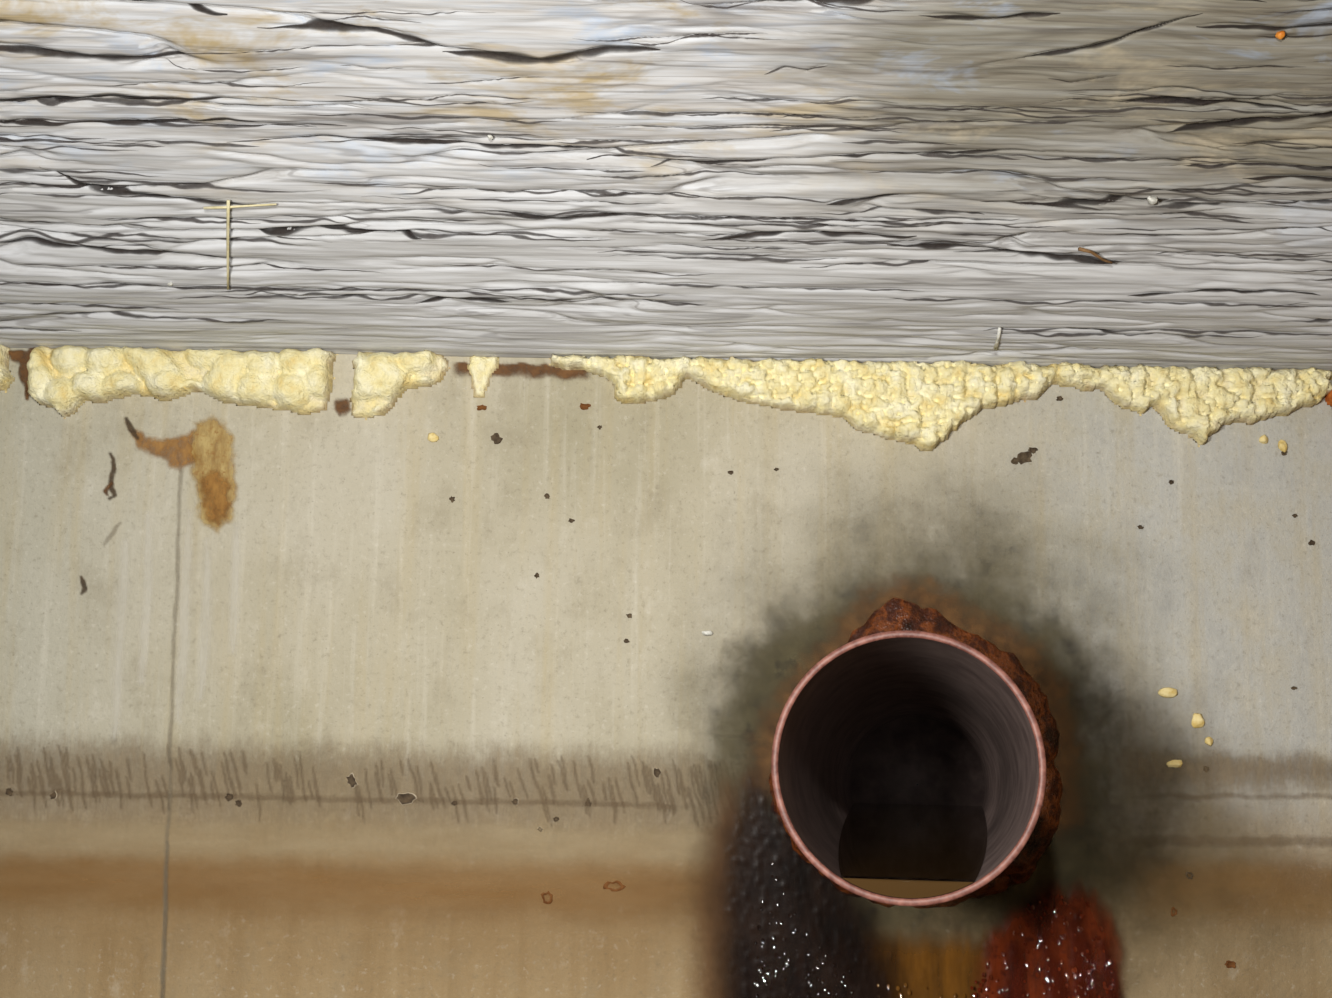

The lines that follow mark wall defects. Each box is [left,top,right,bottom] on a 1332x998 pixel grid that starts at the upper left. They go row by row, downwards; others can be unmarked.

leakage [8,347,36,400]
leakage [335,399,350,415]
leakage [455,362,470,374]
leakage [492,363,587,379]
leakage [0,589,928,998]
rust [752,715,895,908]
rust [815,586,1072,909]
leakage [902,544,1113,913]
rust [877,885,1121,998]